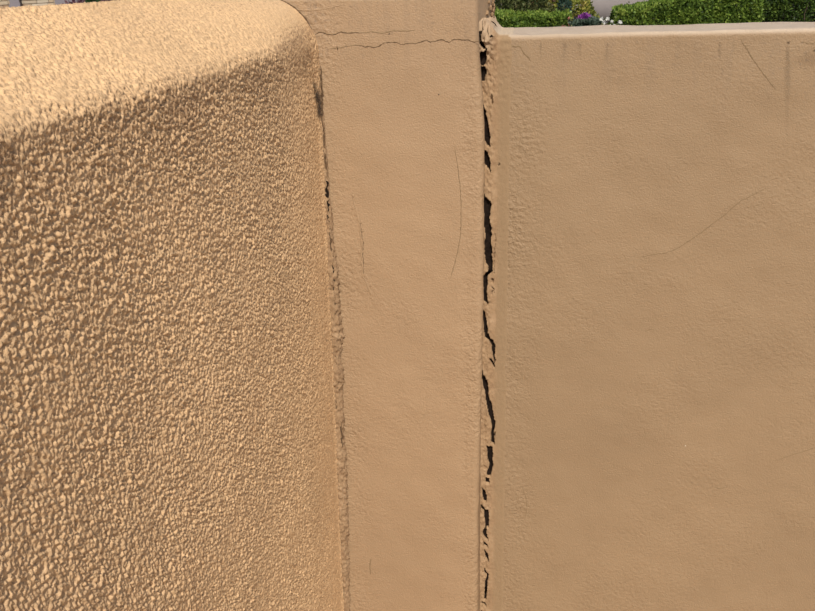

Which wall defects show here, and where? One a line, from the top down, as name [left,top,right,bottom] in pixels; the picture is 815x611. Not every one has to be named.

crack [281,0,497,81]
crack [319,65,337,305]
crack [451,146,462,276]
crack [483,105,491,169]
crack [481,194,496,611]